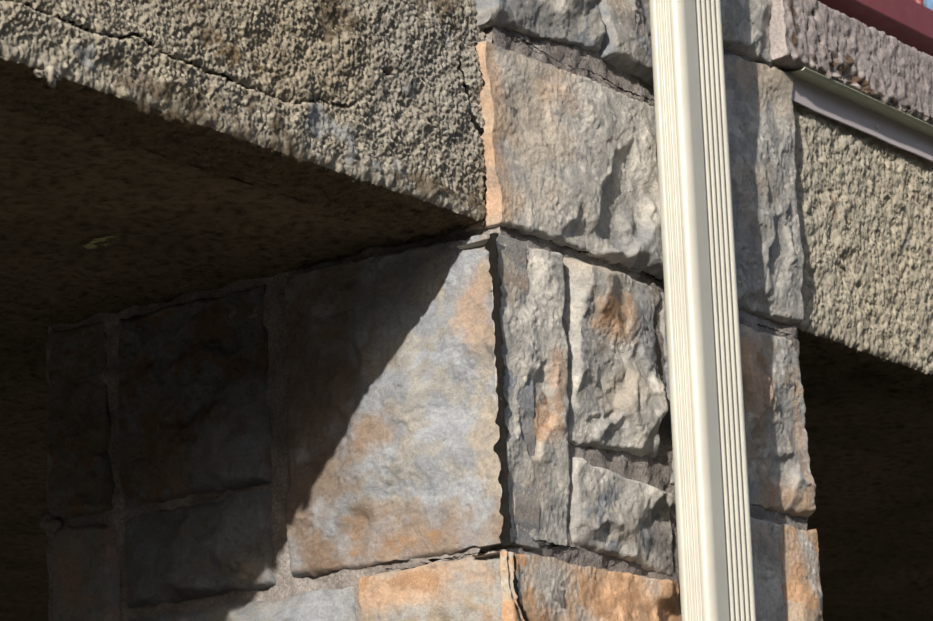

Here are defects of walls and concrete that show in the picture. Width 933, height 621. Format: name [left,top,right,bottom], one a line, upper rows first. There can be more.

crack [1,0,373,108]
crack [501,27,654,101]
crack [550,240,663,282]
crack [383,38,529,621]
crack [533,539,582,551]